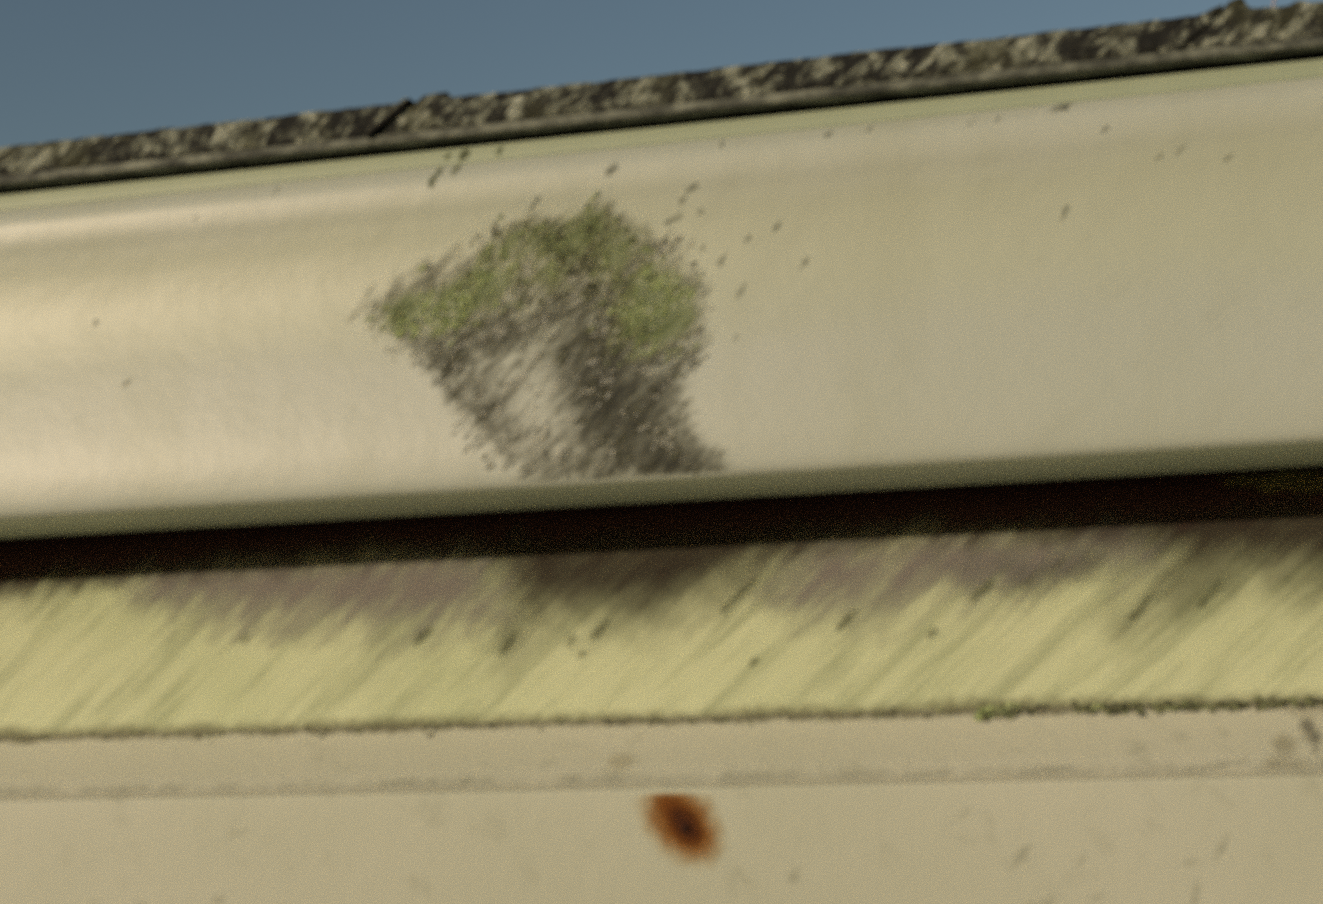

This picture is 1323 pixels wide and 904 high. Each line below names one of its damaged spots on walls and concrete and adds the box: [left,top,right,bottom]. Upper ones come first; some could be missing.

leakage [372,208,725,481]
leakage [0,465,1323,639]
rust [648,794,715,858]